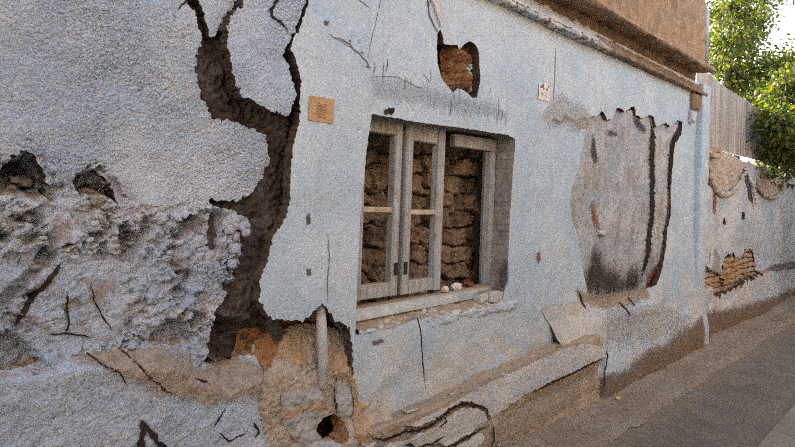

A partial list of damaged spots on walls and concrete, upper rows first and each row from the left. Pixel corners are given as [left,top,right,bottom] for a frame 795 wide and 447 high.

spalling [427,0,443,31]
spalling [439,44,473,95]
spalling [0,137,251,375]
crack [177,0,293,363]
peeling [551,109,697,297]
flaking render [704,245,757,296]
spalling [234,310,607,447]
crack [368,401,495,447]